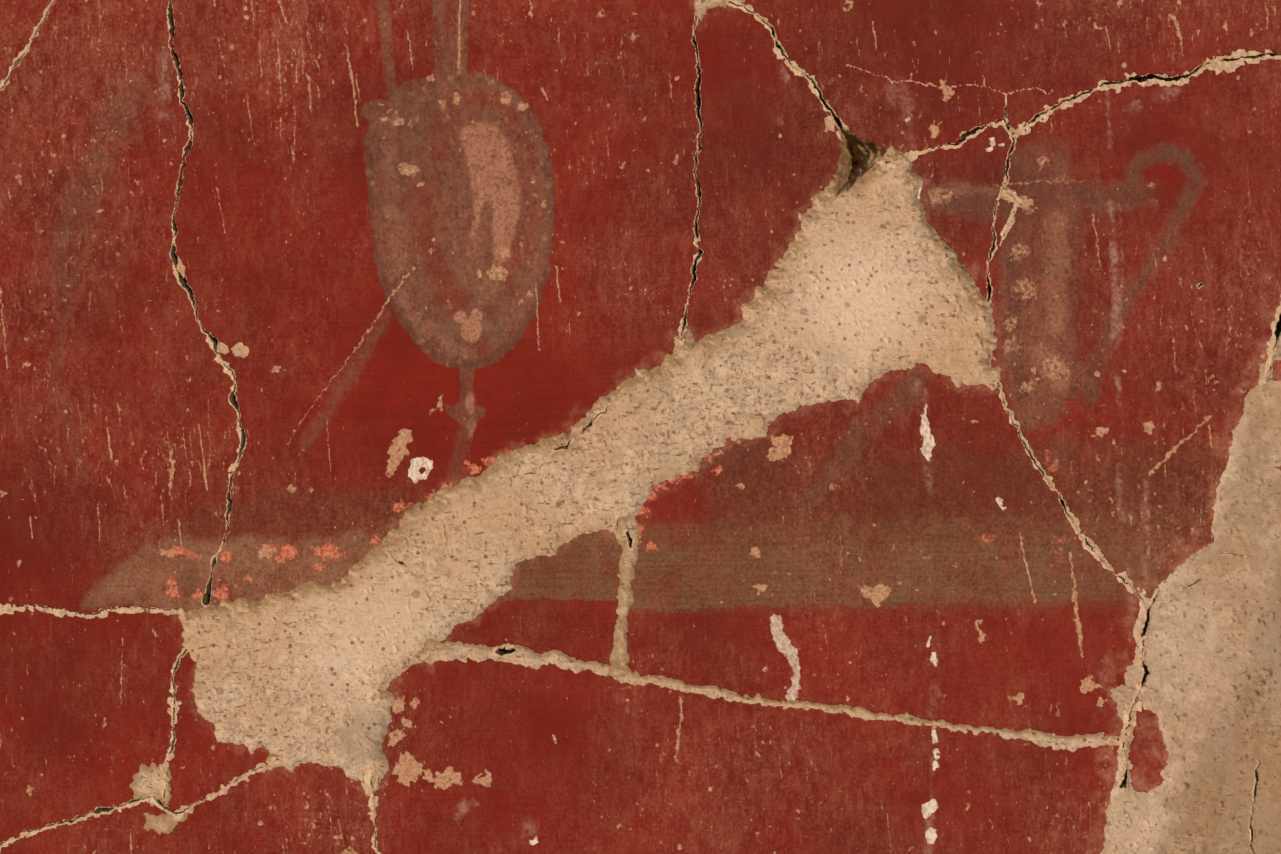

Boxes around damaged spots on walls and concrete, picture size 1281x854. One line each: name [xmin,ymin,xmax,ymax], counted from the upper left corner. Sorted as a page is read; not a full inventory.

spalling [694,0,746,21]
crack [678,0,850,346]
crack [846,49,1281,304]
crack [0,0,249,619]
spalling [156,145,1001,796]
peeling [1037,437,1063,481]
peeling [1037,519,1102,577]
crack [994,380,1250,793]
spalling [1078,320,1281,854]
crack [1258,304,1281,385]
crack [0,647,283,853]
spalling [129,762,192,835]